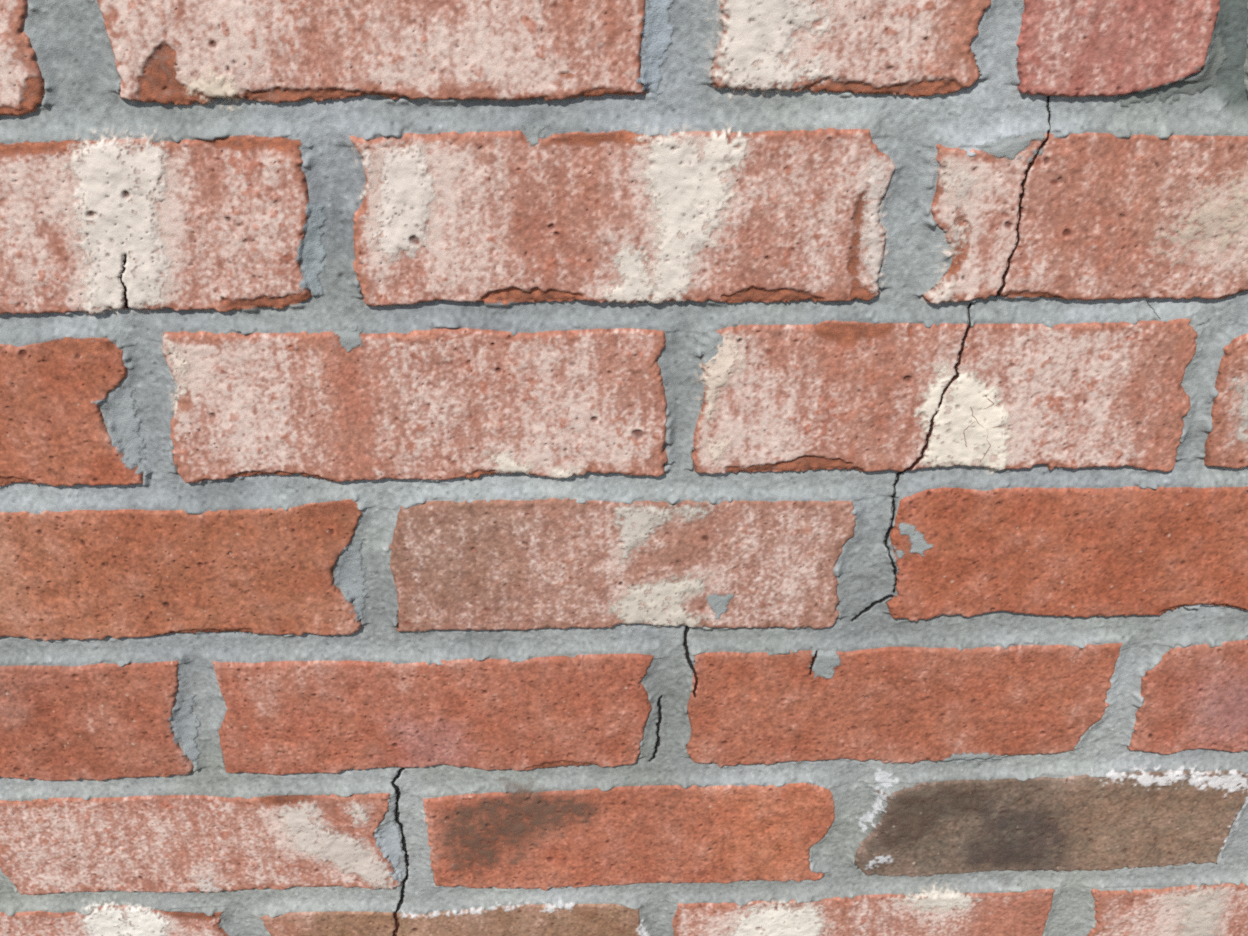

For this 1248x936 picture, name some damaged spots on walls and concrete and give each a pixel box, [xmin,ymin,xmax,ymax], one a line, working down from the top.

crack [851,96,1051,621]
crack [683,626,698,696]
crack [649,696,662,762]
efflorescence [859,768,899,832]
efflorescence [1101,766,1248,851]
crack [391,767,409,936]
efflorescence [866,855,892,869]